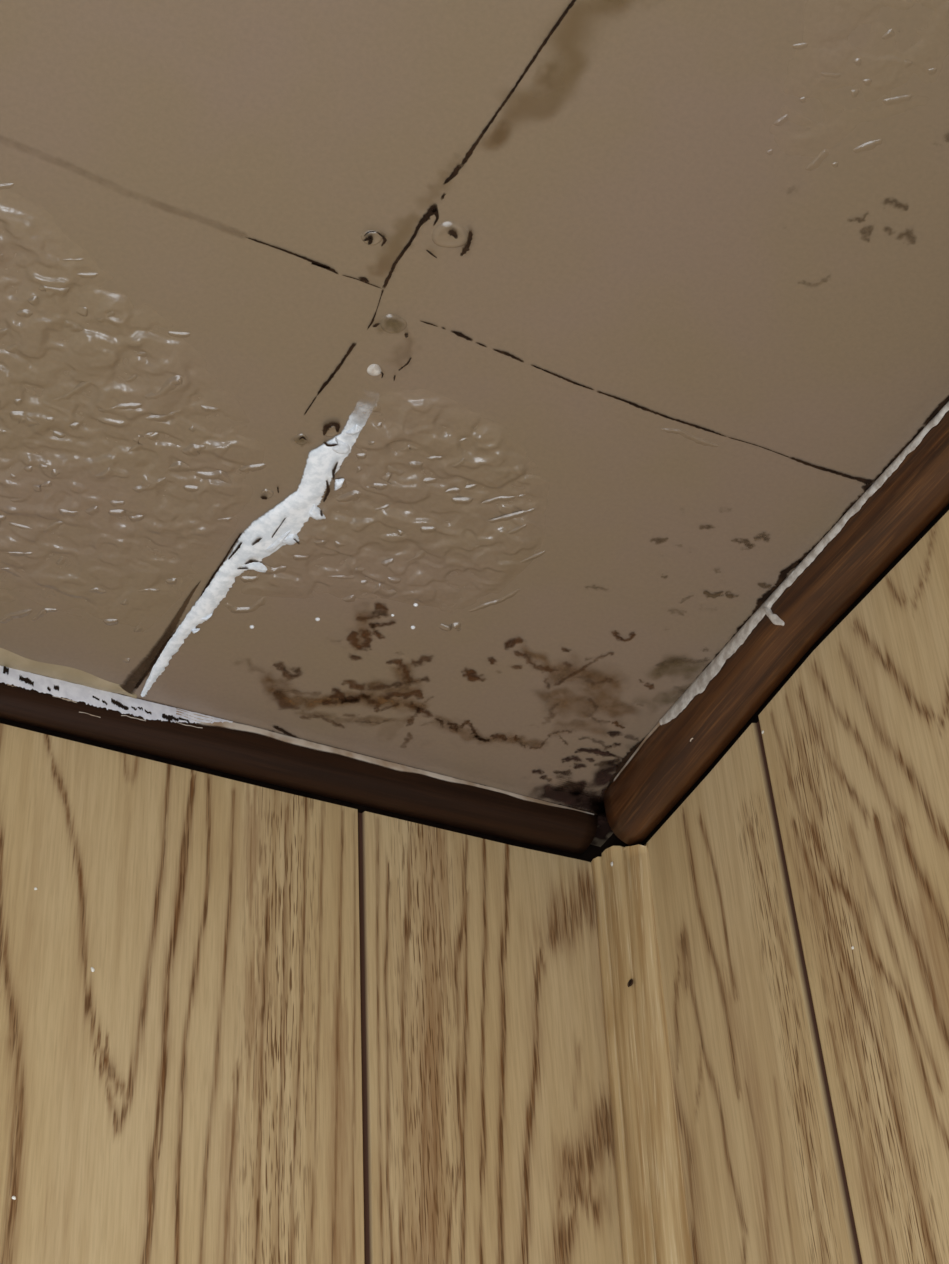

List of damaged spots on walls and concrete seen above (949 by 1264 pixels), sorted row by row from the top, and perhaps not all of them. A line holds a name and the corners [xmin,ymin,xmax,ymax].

peeling [0,415,594,815]
leakage [347,603,395,660]
leakage [266,657,539,745]
leakage [505,638,625,844]